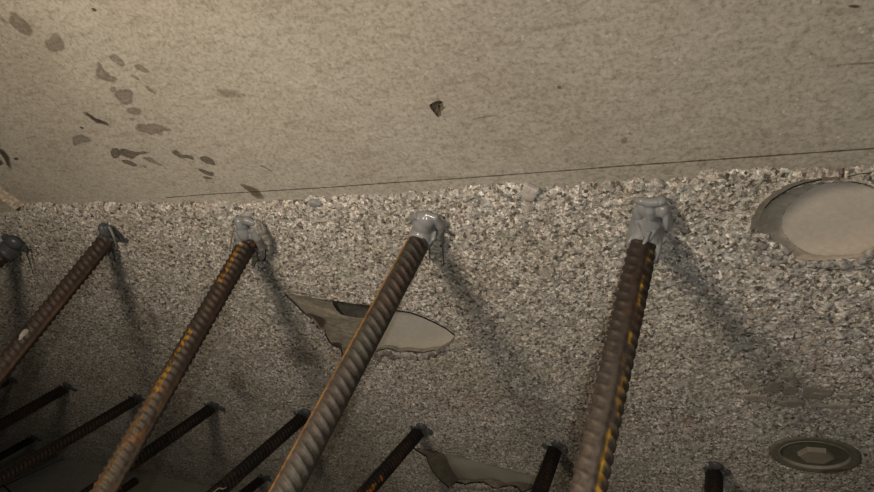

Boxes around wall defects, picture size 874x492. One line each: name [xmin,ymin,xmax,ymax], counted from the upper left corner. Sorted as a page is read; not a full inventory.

spalling [0,215,274,492]
spalling [207,210,445,492]
spalling [530,178,673,492]
spalling [703,461,731,492]